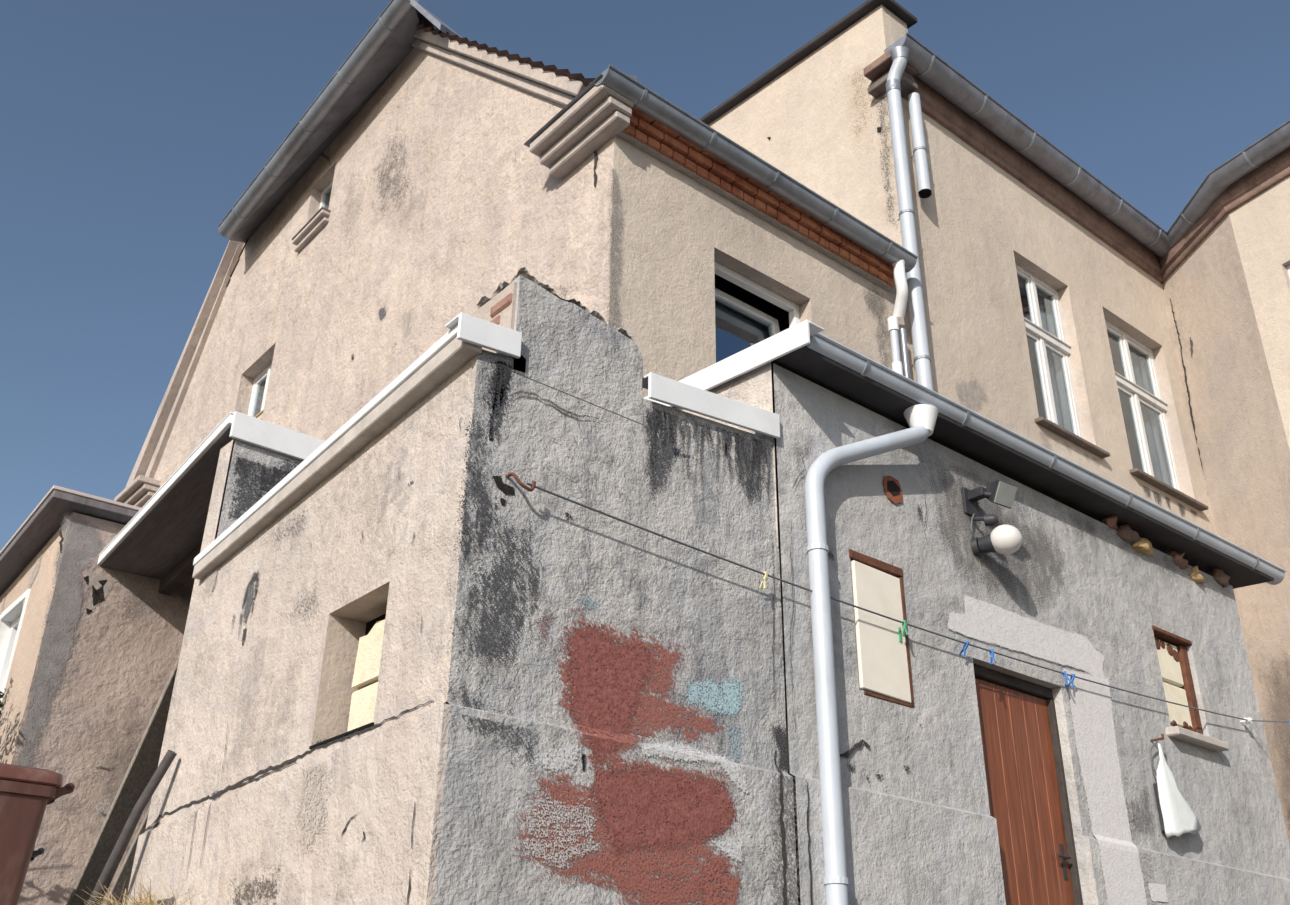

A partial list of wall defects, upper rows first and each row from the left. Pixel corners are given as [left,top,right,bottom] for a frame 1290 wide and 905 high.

water stain [335,117,429,253]
water stain [226,453,302,520]
water stain [642,405,772,538]
peeling [14,511,134,767]
water stain [231,570,260,645]
water stain [438,358,556,777]